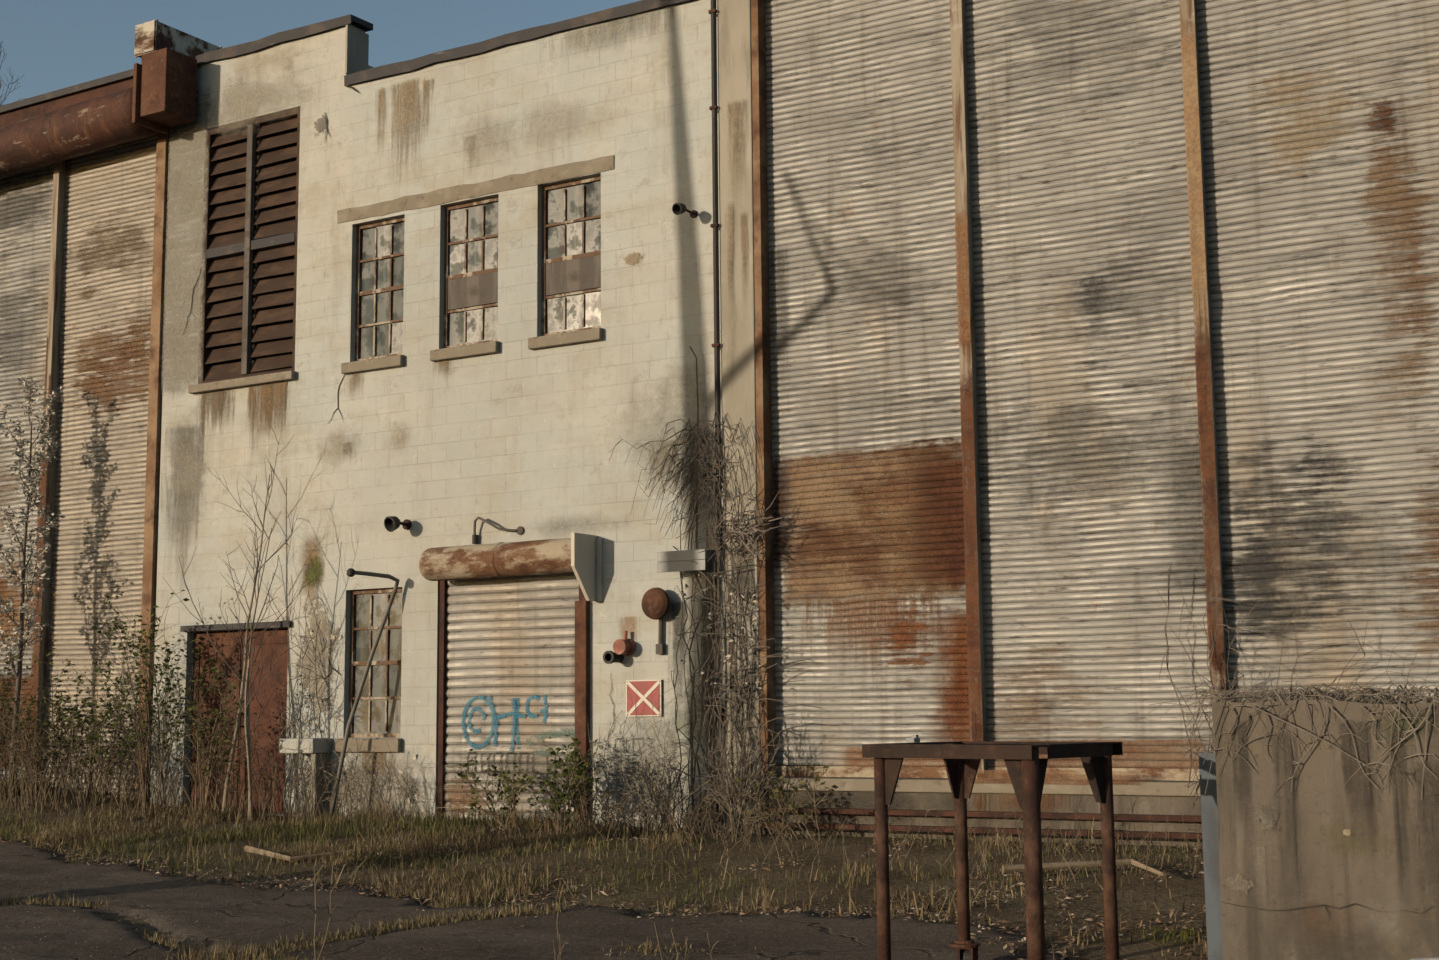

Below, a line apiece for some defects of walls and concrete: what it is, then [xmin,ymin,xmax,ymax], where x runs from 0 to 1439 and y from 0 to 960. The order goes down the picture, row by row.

leakage [378,79,434,147]
corrosion [1368,100,1397,130]
corrosion [1364,145,1438,335]
corrosion [44,314,151,415]
leakage [161,389,234,544]
corrosion [772,212,987,741]
leakage [1306,446,1356,483]
corrosion [0,444,55,769]
leakage [1234,511,1279,635]
corrosion [902,758,946,769]
corrosion [974,759,1019,811]
corrosion [1012,740,1203,807]